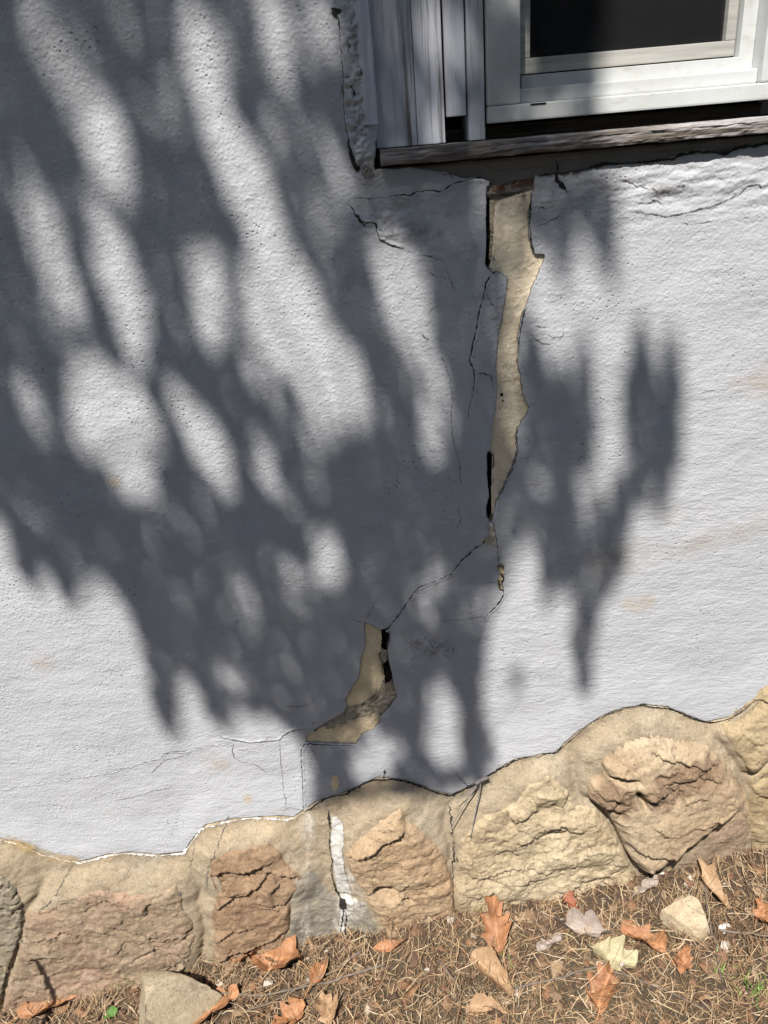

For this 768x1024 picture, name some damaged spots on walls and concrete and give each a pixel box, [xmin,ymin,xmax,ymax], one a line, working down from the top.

crack [332,6,503,482]
crack [537,142,768,225]
spalling [478,190,543,548]
spalling [306,623,396,743]
crack [355,452,507,683]